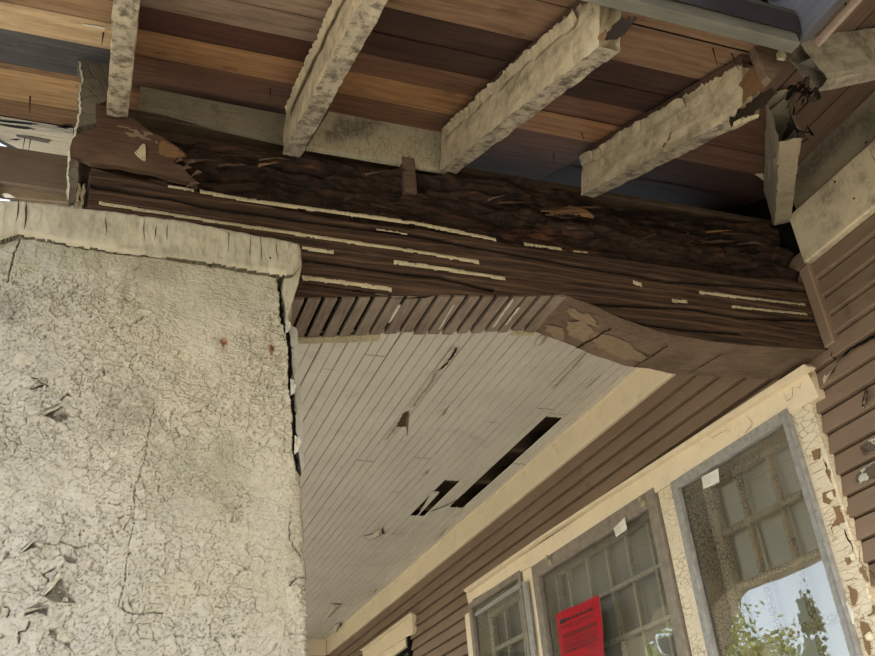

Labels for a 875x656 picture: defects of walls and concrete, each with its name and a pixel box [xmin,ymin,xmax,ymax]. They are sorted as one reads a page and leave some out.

peeling [135,144,146,162]
crack [9,201,28,276]
peeling [545,308,648,362]
crack [278,284,301,472]
spalling [42,405,68,422]
peeling [856,438,875,483]
peeling [822,469,850,535]
peeling [844,553,871,583]
spalling [23,573,75,632]
peeling [847,584,858,606]
peeling [859,605,875,655]